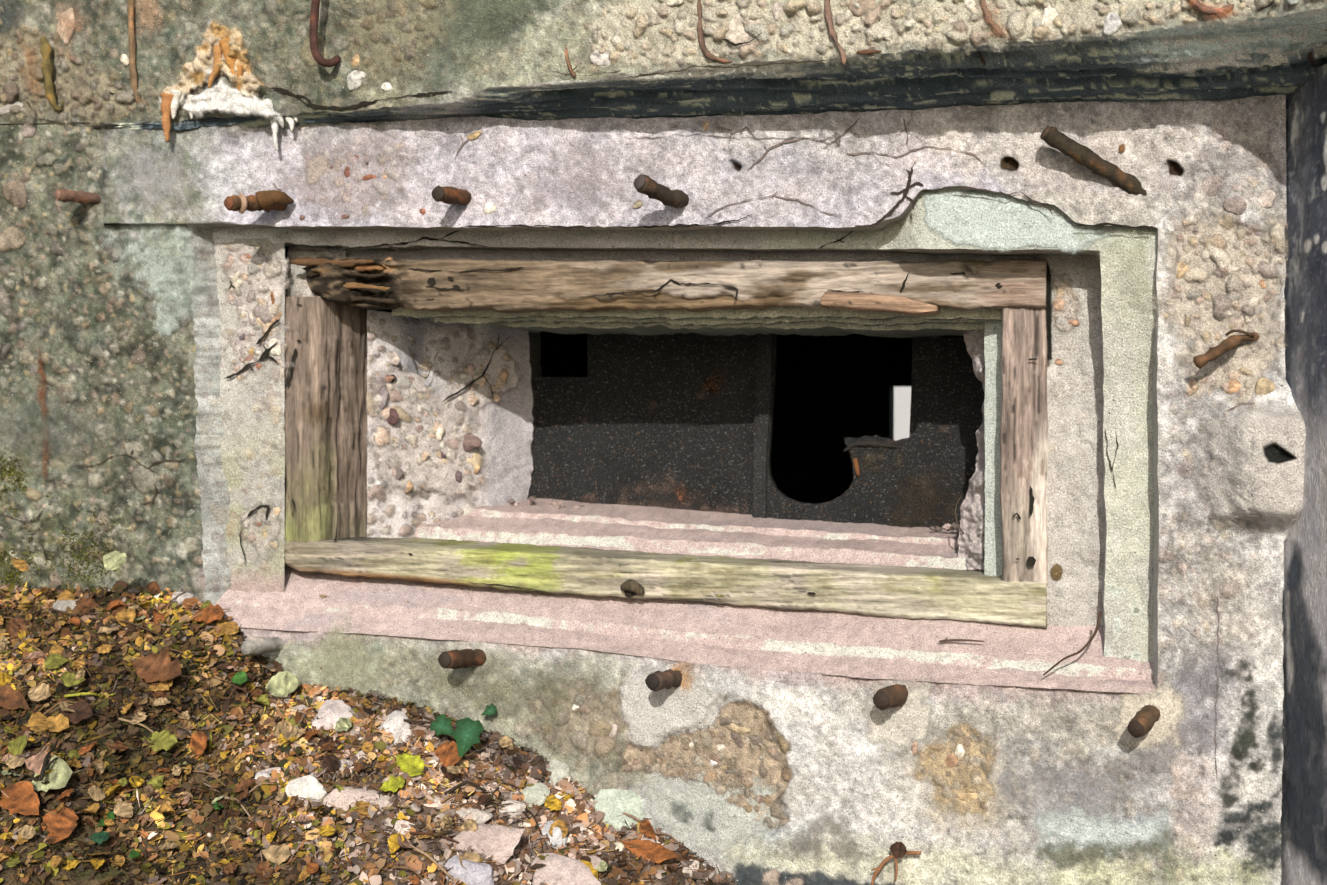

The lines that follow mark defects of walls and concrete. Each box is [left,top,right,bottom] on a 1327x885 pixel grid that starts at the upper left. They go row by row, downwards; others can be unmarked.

corrosion [136,0,162,27]
spalling [585,0,1326,71]
leakage [130,21,298,203]
corrosion [255,189,294,213]
crack [283,118,1155,253]
spalling [527,680,792,828]
leakage [1182,545,1327,882]